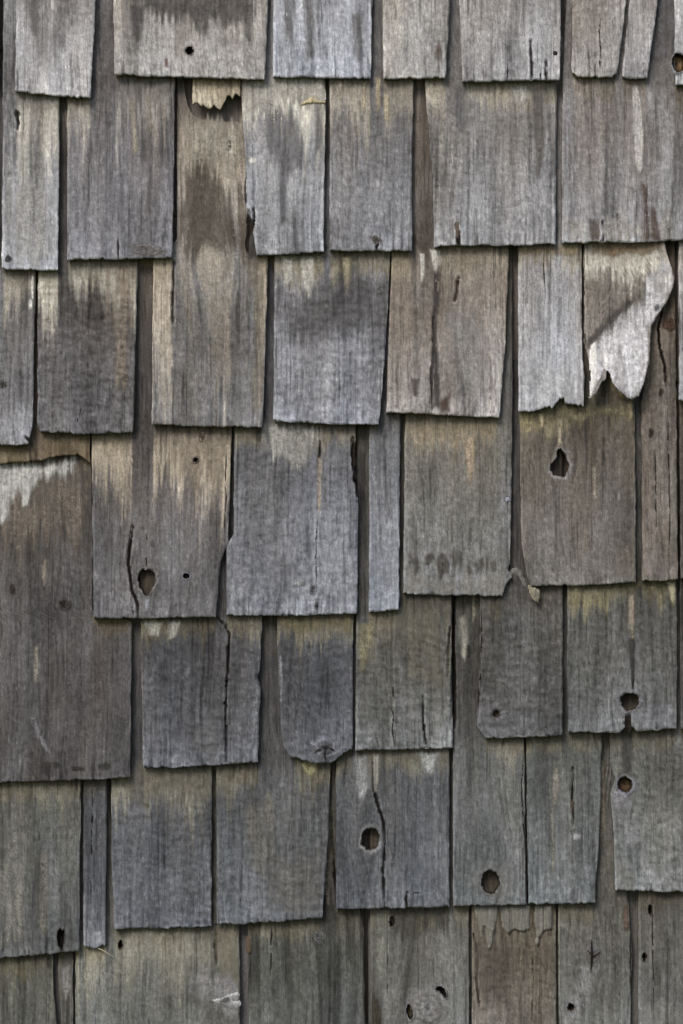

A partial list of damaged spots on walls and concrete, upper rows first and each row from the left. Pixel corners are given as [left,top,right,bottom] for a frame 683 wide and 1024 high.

leakage [180,163,259,260]
crack [126,535,148,615]
crack [372,777,419,907]